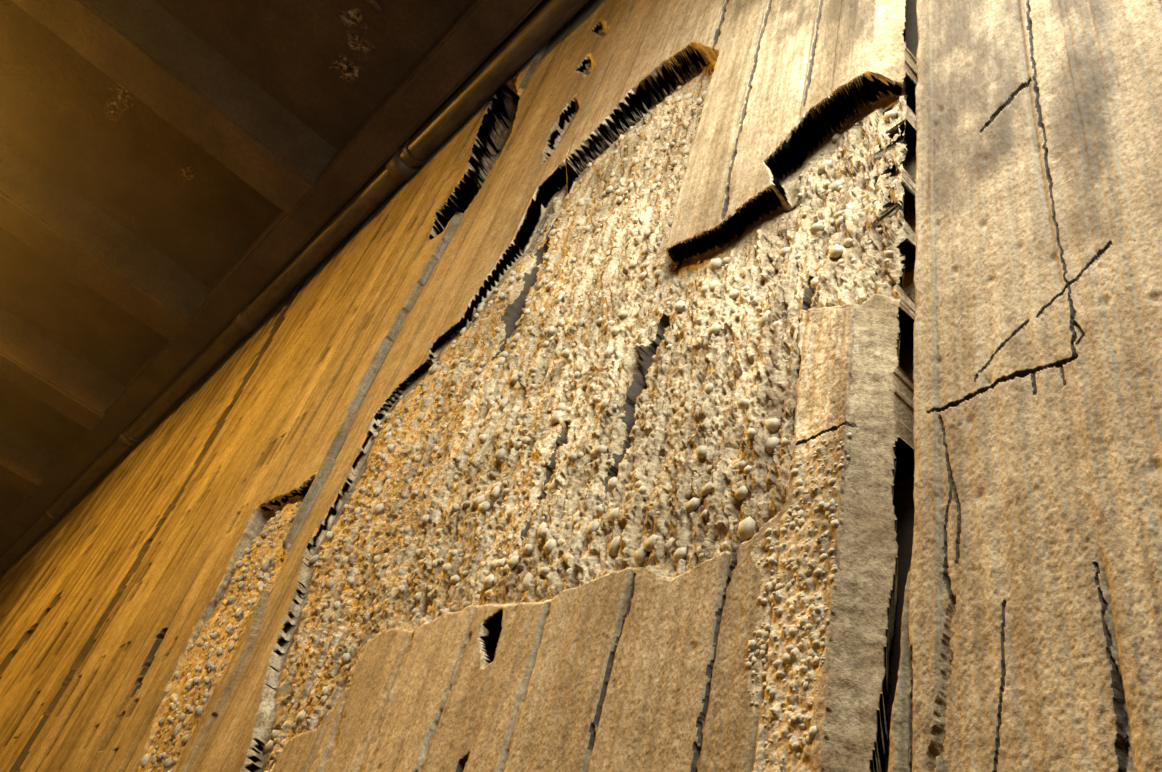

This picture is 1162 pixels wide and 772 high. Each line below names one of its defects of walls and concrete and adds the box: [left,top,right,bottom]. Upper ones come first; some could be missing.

spalling [137,472,318,772]
spalling [241,42,917,772]
crack [909,0,1112,772]
crack [1092,562,1130,772]